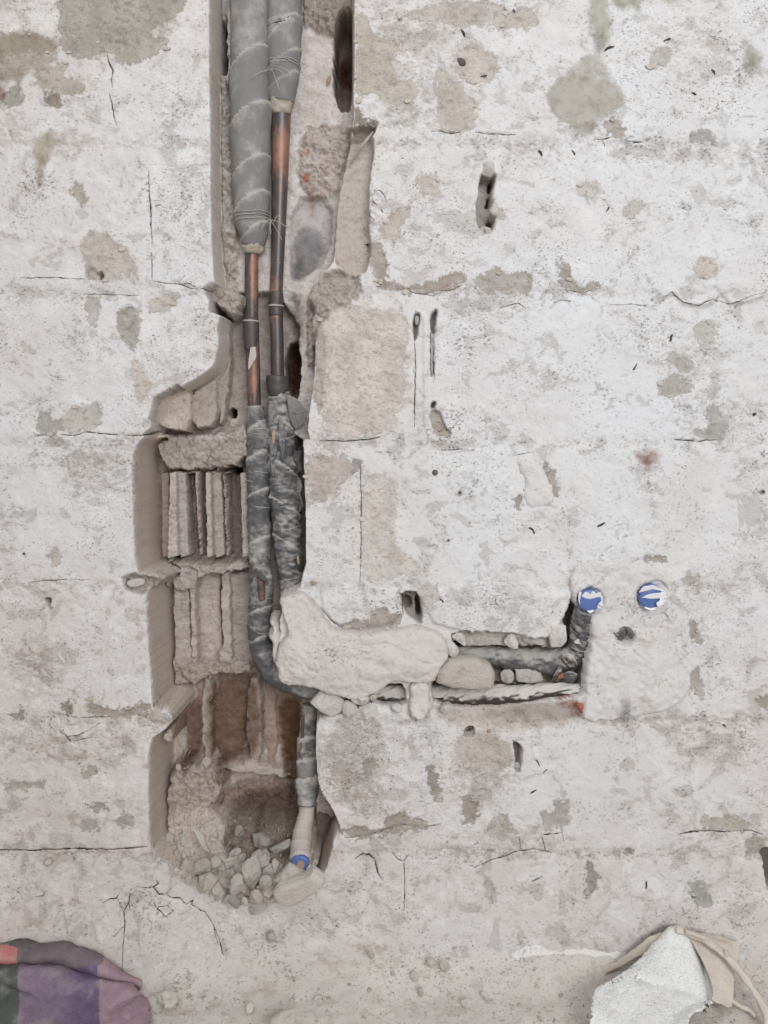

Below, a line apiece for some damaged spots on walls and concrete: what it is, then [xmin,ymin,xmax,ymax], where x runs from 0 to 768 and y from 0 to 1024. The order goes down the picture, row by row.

flaking render [0,0,186,108]
flaking render [603,116,628,139]
flaking render [79,226,137,282]
flaking render [116,292,181,401]
crack [34,430,162,438]
flaking render [341,607,403,630]
crack [0,844,144,852]
crack [345,824,434,908]
crack [474,824,564,868]
crack [89,881,231,961]